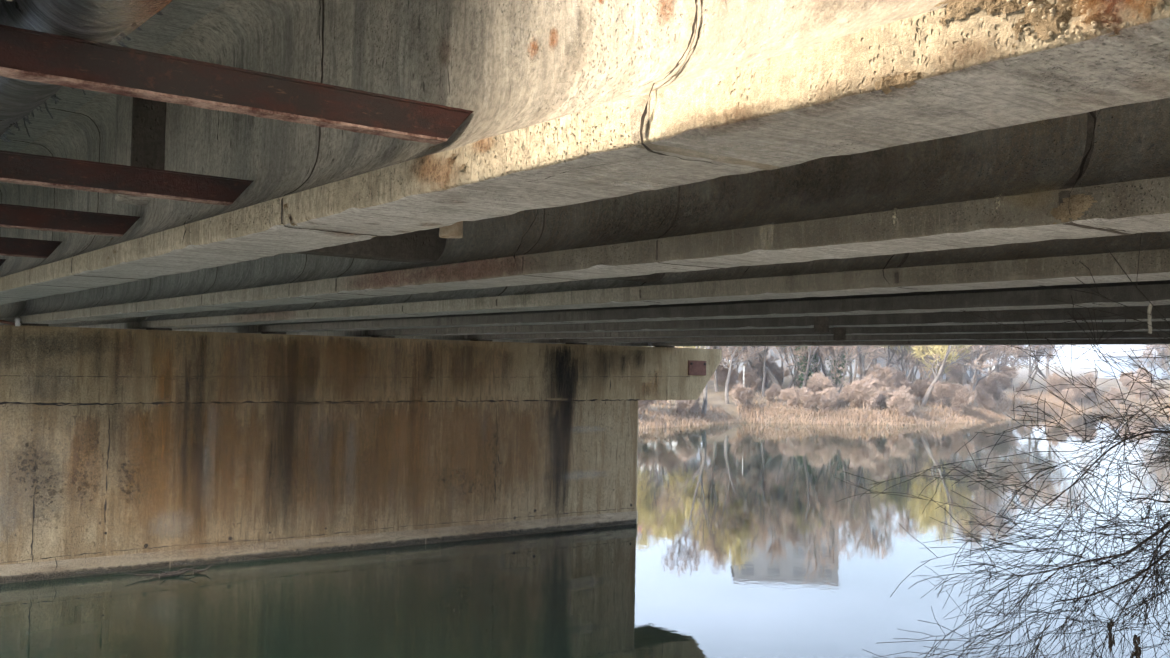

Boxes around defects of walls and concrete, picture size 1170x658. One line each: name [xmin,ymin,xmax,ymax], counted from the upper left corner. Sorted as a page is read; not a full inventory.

crack [622,0,726,167]
crack [1059,109,1101,215]